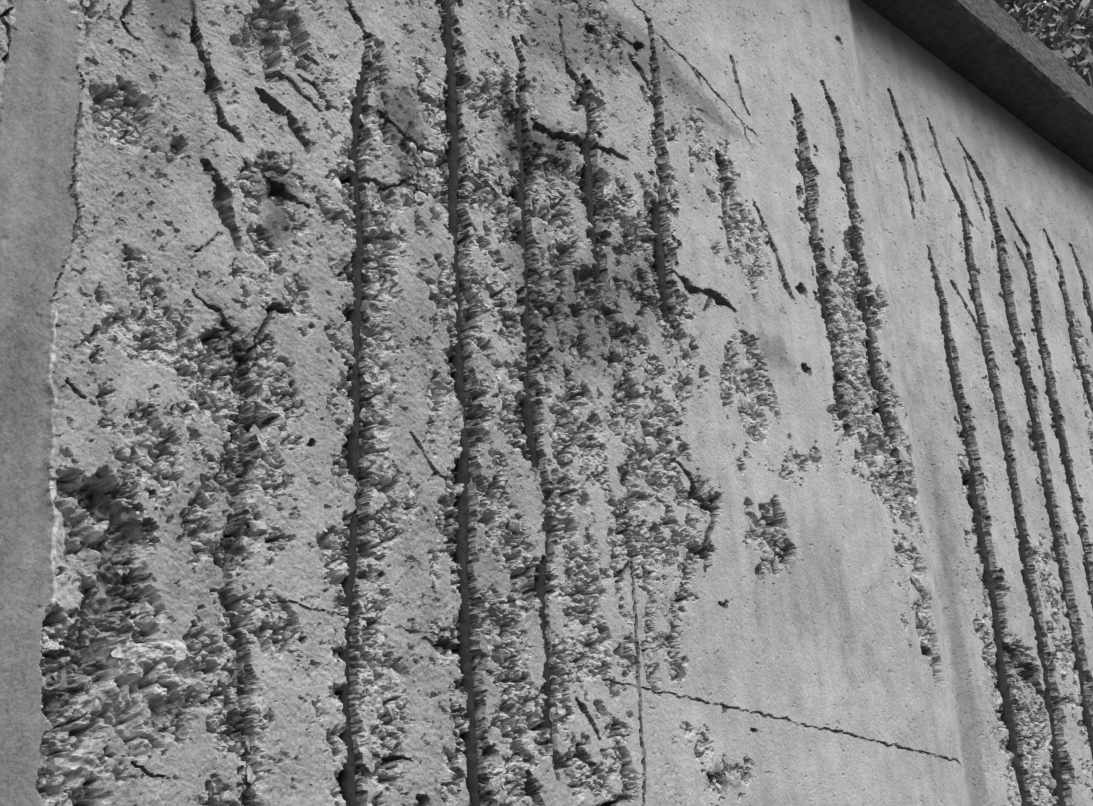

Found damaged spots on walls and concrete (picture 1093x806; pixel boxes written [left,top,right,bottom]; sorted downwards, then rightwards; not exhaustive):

spalling [0,5,16,31]
crack [51,64,86,298]
spalling [80,74,190,180]
spalling [36,243,316,806]
spalling [220,0,824,806]
crack [502,751,546,806]
crack [573,696,601,775]
crack [584,456,962,806]
spalling [814,203,945,685]
spalling [957,454,1093,806]
spalling [1069,302,1093,464]